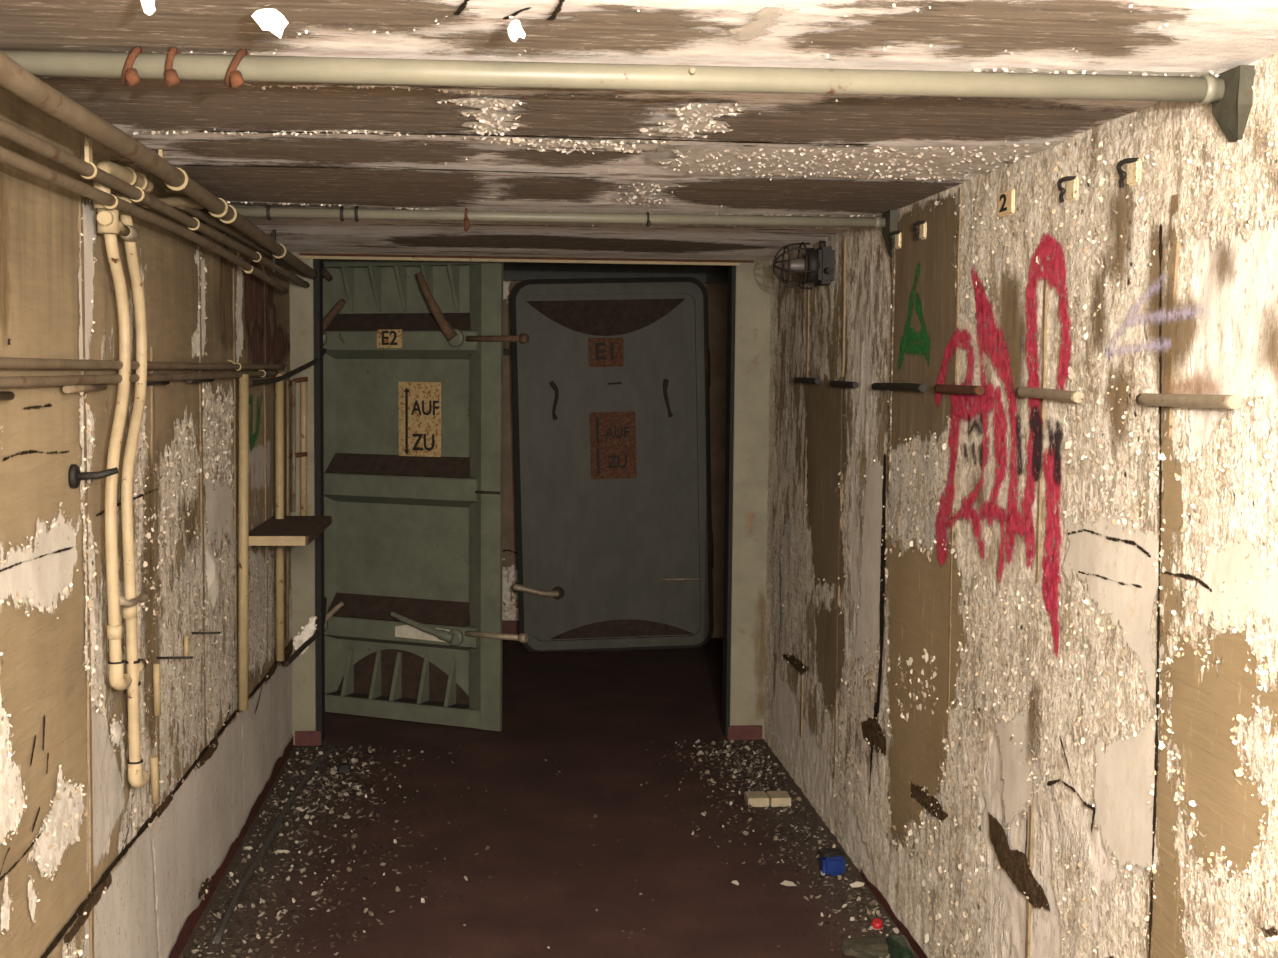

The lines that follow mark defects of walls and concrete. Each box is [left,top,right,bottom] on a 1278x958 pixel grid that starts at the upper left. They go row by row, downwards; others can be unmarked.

peeling [77,199,97,360]
peeling [382,221,840,253]
peeling [1164,60,1278,266]
peeling [0,765,88,937]
peeling [0,392,104,713]
peeling [117,381,317,859]
peeling [770,364,849,675]
peeling [815,597,886,839]
spalling [988,812,1050,917]
crack [1022,812,1030,855]
crack [1047,736,1096,832]
crack [1068,224,1212,958]